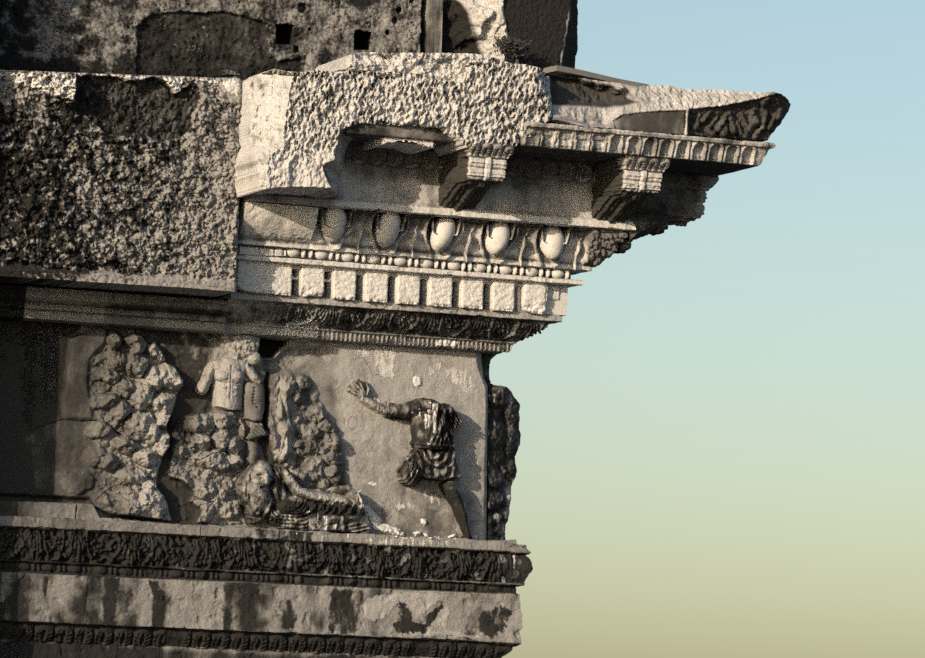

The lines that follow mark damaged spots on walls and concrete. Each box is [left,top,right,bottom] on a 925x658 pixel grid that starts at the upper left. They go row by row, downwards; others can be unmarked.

flaking render [0,10,327,141]
water stain [222,585,233,631]
water stain [328,588,363,635]